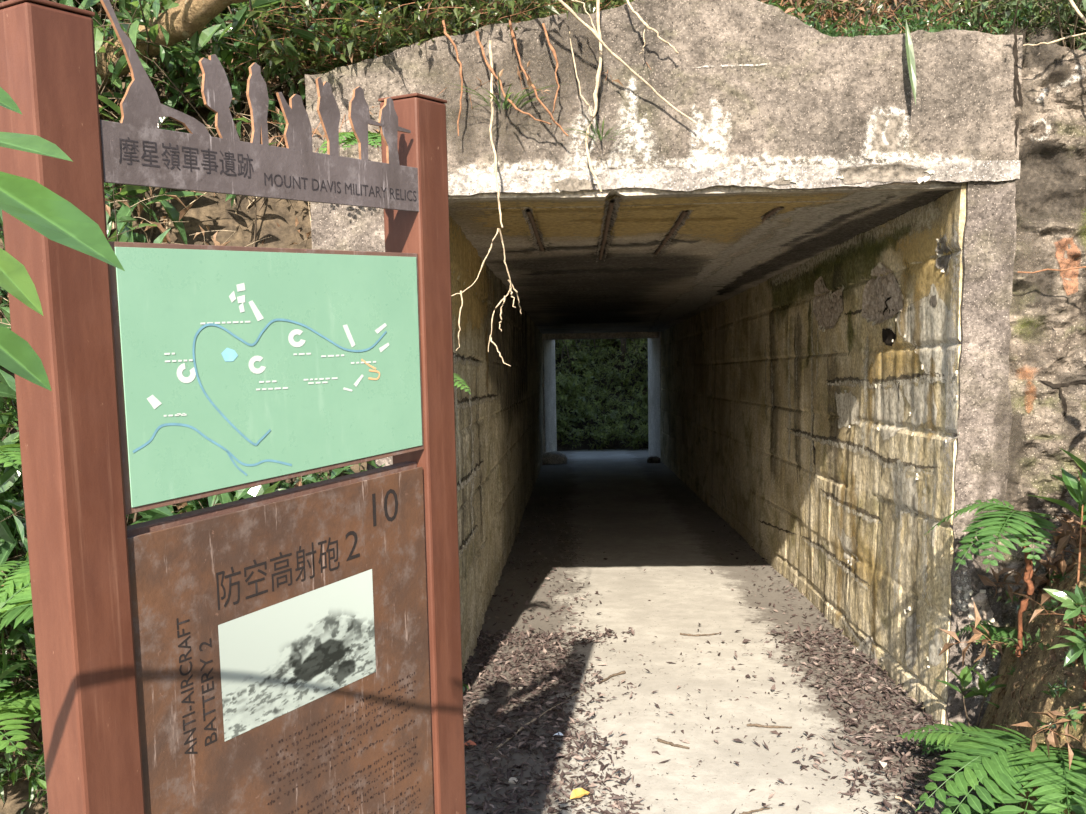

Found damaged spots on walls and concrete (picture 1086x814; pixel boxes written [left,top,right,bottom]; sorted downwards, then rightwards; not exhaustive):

damp [463,79,964,174]
spalling [523,207,547,255]
spalling [596,195,622,262]
rust [473,193,839,243]
rust [449,222,495,342]
crack [827,371,946,398]
damp [932,224,962,547]
crack [787,409,935,525]
crack [758,520,873,655]